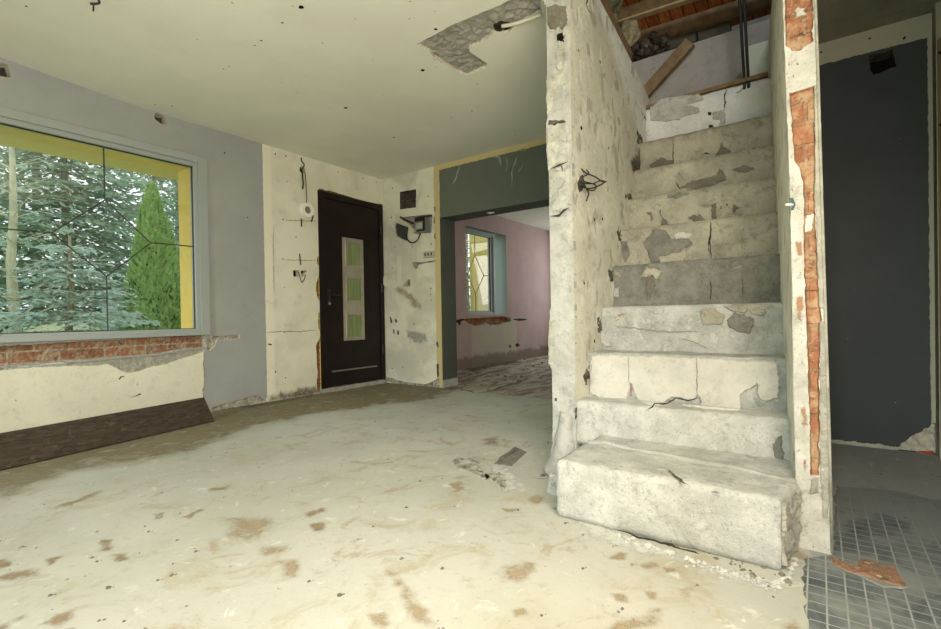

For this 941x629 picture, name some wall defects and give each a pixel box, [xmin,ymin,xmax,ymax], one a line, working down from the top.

flaking render [785,0,814,51]
spalling [417,0,584,213]
flaking render [650,94,726,128]
flaking render [643,210,693,263]
flaking render [0,334,240,397]
flaking render [456,316,527,326]
flaking render [548,318,558,366]
crack [619,326,708,409]
peeling [589,354,780,411]
flaking render [727,312,754,334]
flaking render [782,85,829,567]
flaking render [899,423,936,454]